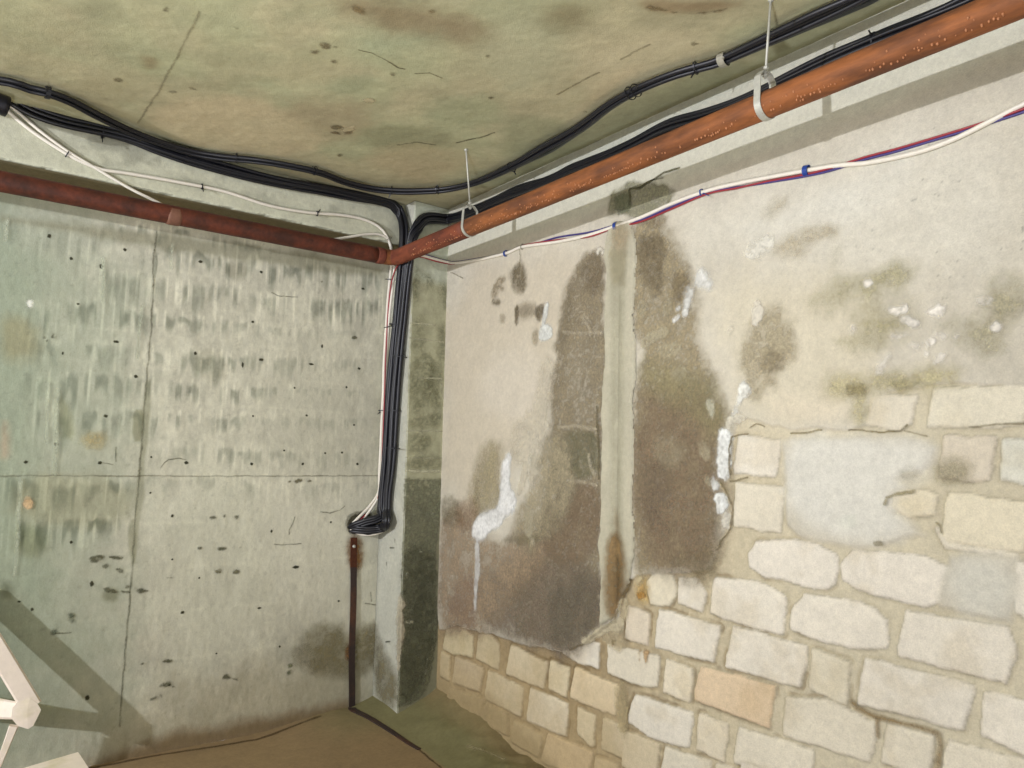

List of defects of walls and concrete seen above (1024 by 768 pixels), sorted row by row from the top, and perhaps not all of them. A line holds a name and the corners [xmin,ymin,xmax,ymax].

water stain [867,305,919,331]
water stain [928,305,944,315]
water stain [609,182,793,572]
water stain [307,247,605,707]
rust [605,535,624,616]
spalling [582,598,627,650]